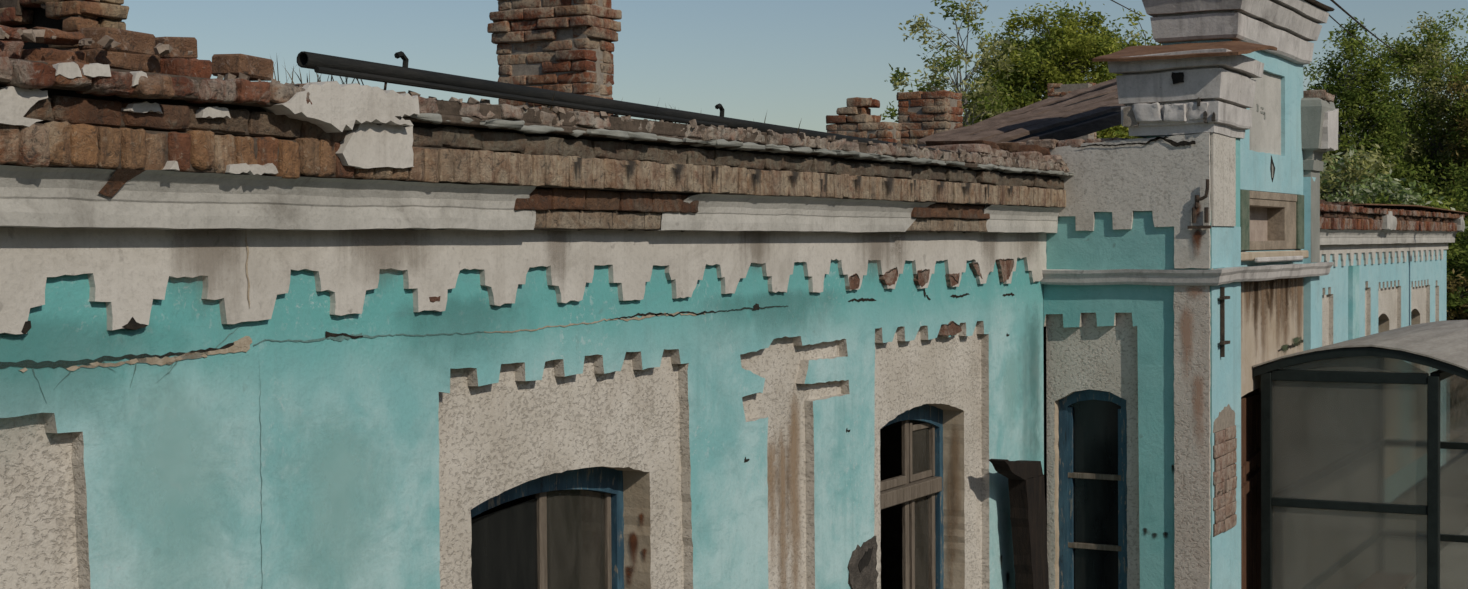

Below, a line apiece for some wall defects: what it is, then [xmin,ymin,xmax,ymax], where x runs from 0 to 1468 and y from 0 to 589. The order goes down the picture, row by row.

peeling [0,62,111,127]
peeling [121,71,163,114]
peeling [195,106,231,119]
peeling [261,81,420,169]
spalling [99,161,180,198]
peeling [224,163,278,175]
spalling [845,273,860,290]
spalling [879,258,1014,287]
water stain [1241,277,1303,351]
crack [0,303,788,403]
water stain [767,411,799,578]